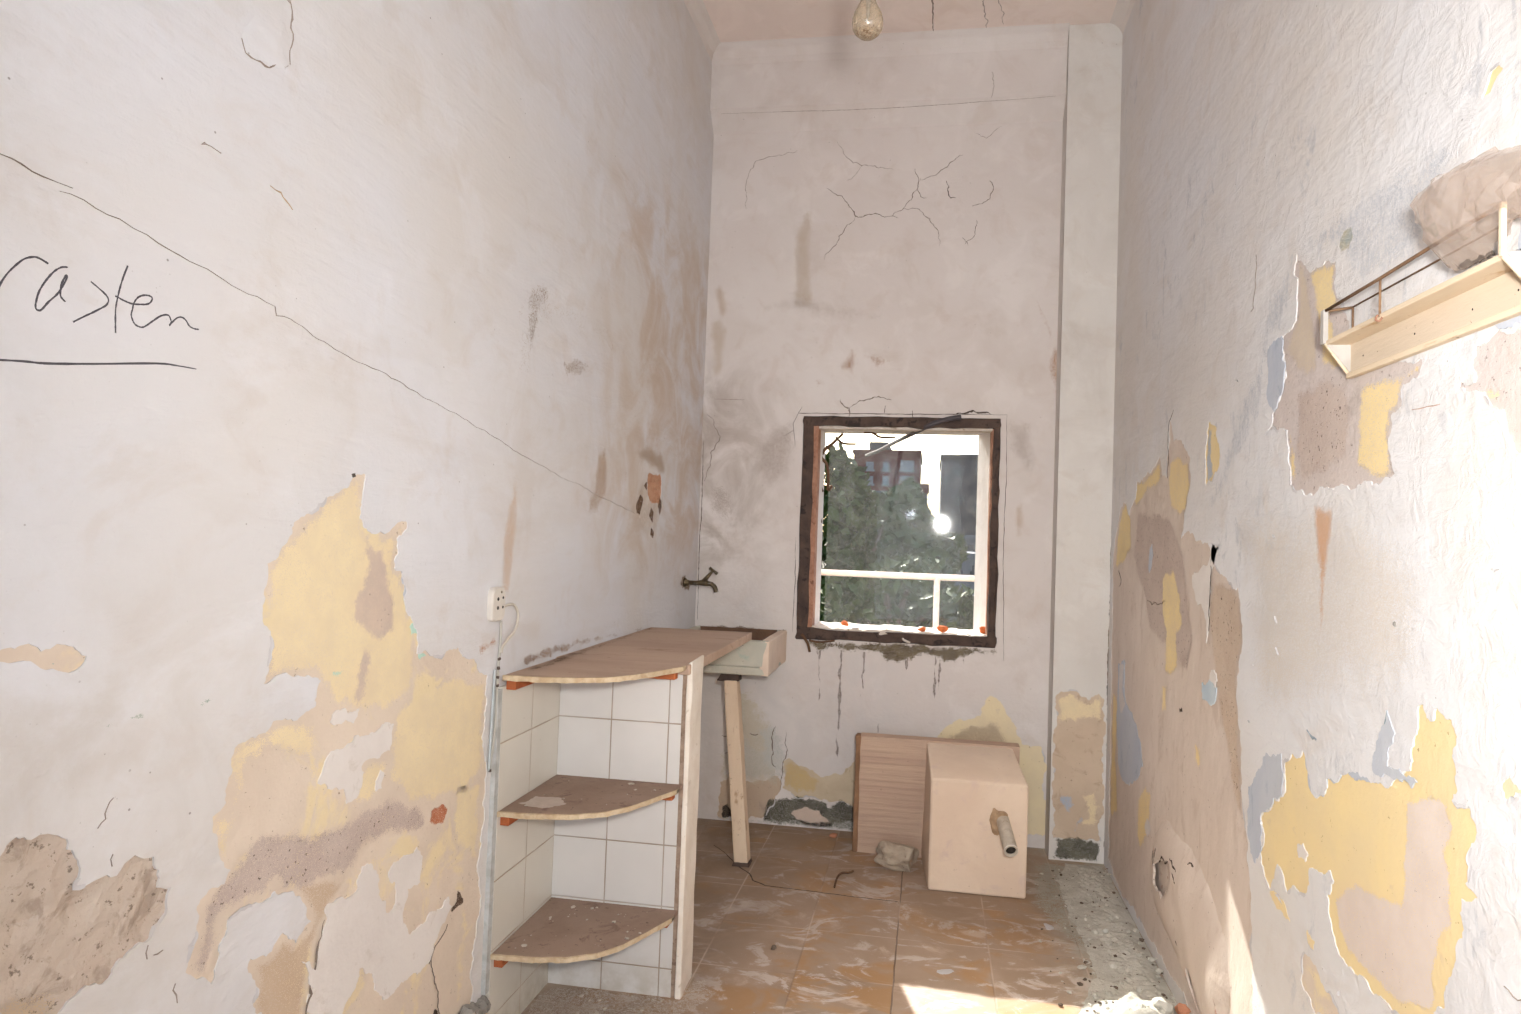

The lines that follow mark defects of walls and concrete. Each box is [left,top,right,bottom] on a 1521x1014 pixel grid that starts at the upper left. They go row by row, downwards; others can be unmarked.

crack [286,0,294,65]
peeling [1484,62,1503,96]
crack [724,72,1053,255]
peeling [1266,227,1422,496]
flaking render [1460,315,1521,453]
flaking render [636,473,663,538]
peeling [0,644,85,673]
peeling [186,473,491,1014]
peeling [717,729,855,821]
leakage [818,650,842,756]
peeling [937,422,1477,1014]
flaking render [0,834,168,1014]